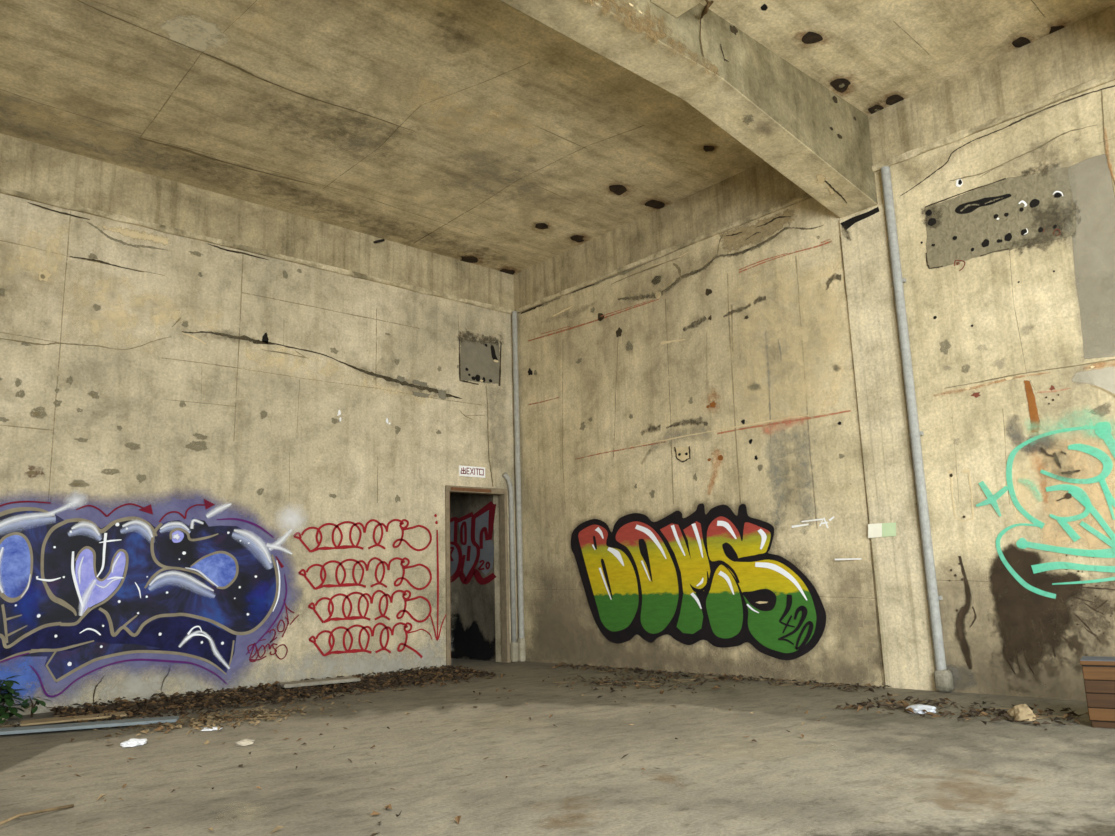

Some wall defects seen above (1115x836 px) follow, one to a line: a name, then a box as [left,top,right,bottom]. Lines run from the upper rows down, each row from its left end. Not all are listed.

crack [618,85,1115,300]
crack [0,317,493,486]
rust [947,359,1115,433]
spalling [1089,403,1109,416]
peeling [1044,437,1115,548]
damp [937,544,1115,701]